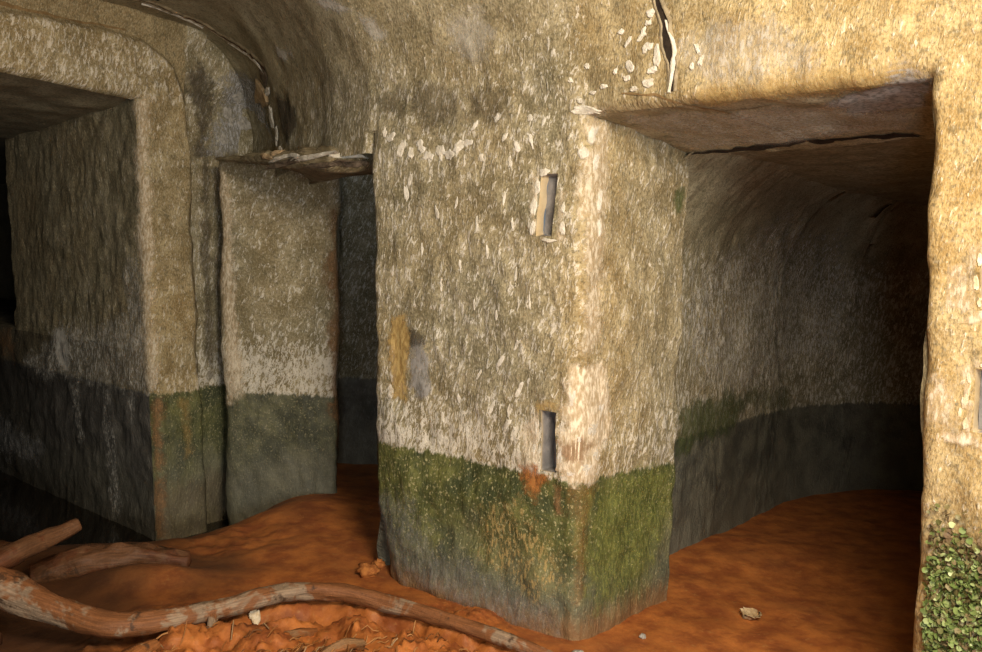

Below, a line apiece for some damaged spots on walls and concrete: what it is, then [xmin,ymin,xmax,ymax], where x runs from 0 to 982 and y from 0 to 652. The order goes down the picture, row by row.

spalling [204,66,369,170]
crack [621,0,922,155]
rust [520,466,547,489]